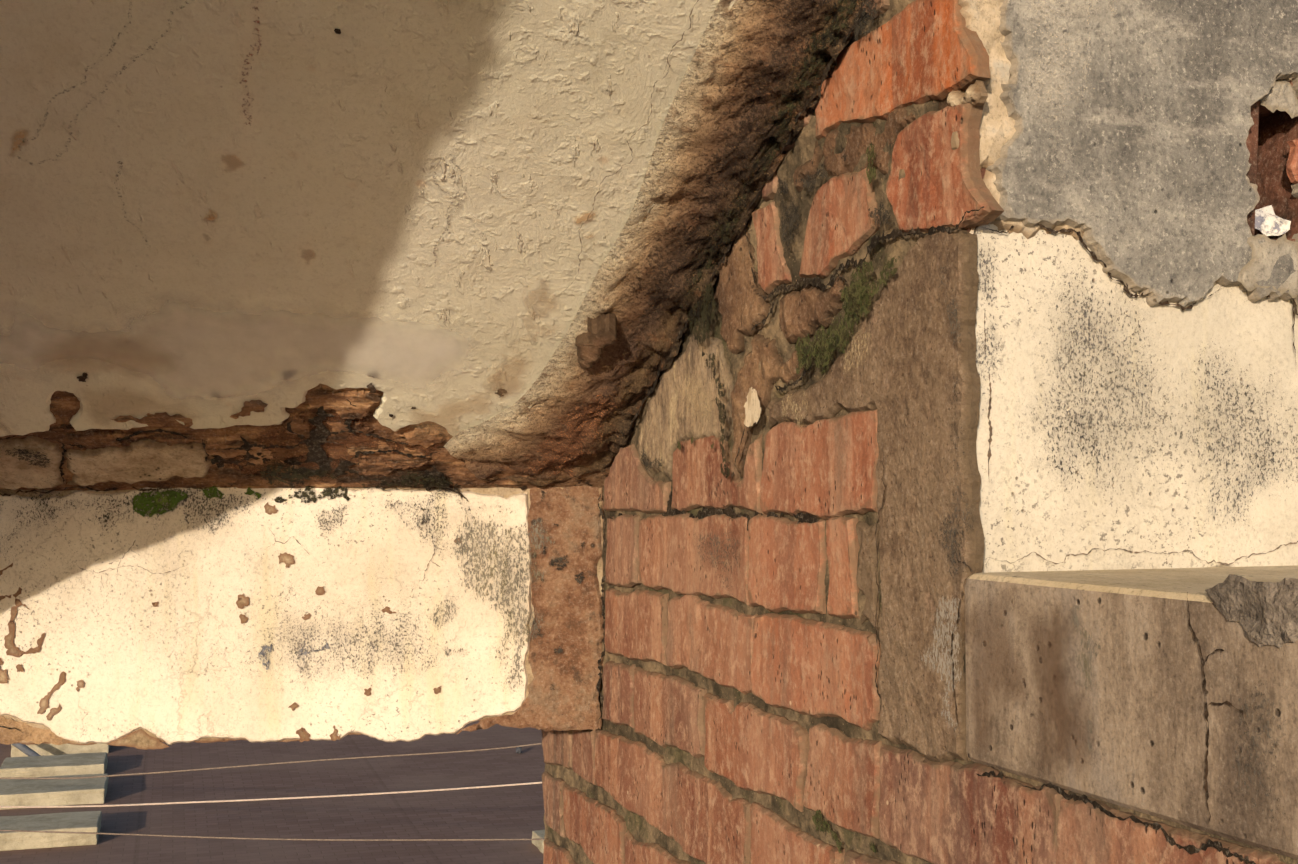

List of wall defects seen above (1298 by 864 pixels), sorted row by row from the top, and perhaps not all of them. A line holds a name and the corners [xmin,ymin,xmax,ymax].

spalling [1261,80,1298,118]
leakage [616,0,882,363]
spalling [54,371,461,492]
peeling [575,312,617,370]
leakage [1031,258,1298,536]
leakage [0,486,263,552]
peeling [0,587,45,684]
leakage [254,600,463,689]
leakage [381,485,585,694]
crack [950,541,1298,733]
spalling [0,671,84,745]
crack [976,592,1256,864]